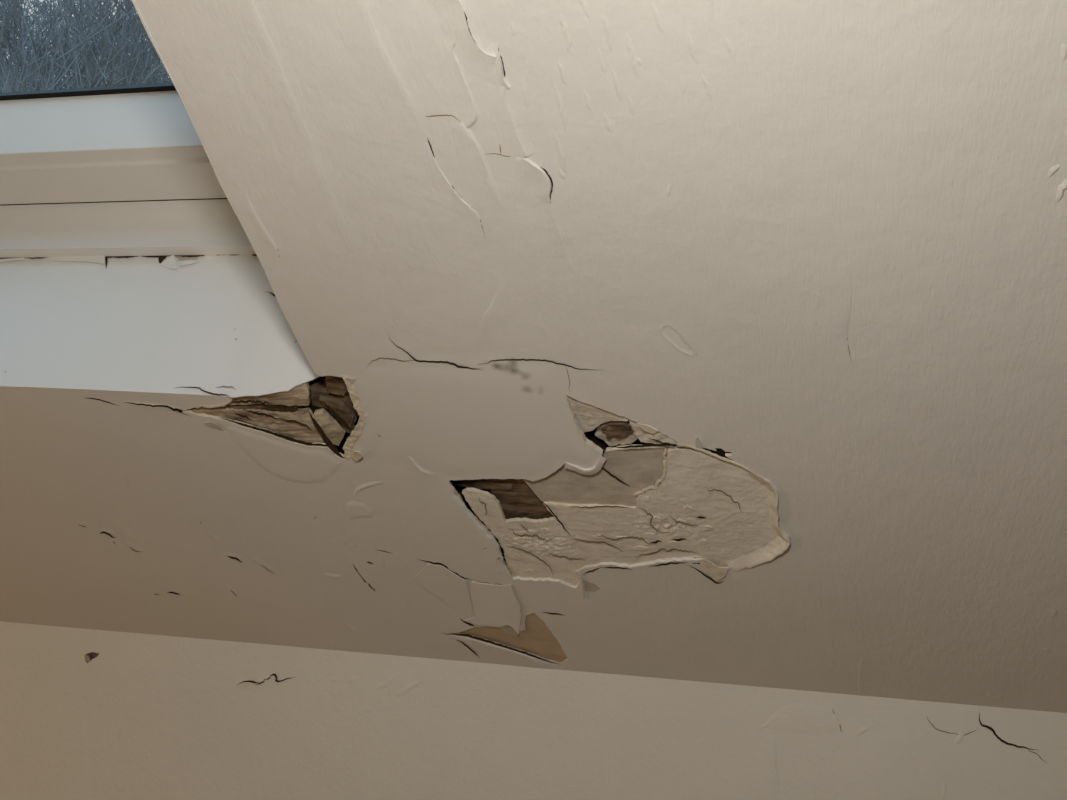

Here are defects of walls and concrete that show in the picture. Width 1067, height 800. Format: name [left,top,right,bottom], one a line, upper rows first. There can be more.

peeling [0,254,205,269]
crack [369,337,594,393]
crack [86,386,234,419]
flaking render [191,375,366,463]
flaking render [378,396,790,670]
crack [232,674,299,699]
crack [927,709,1047,764]